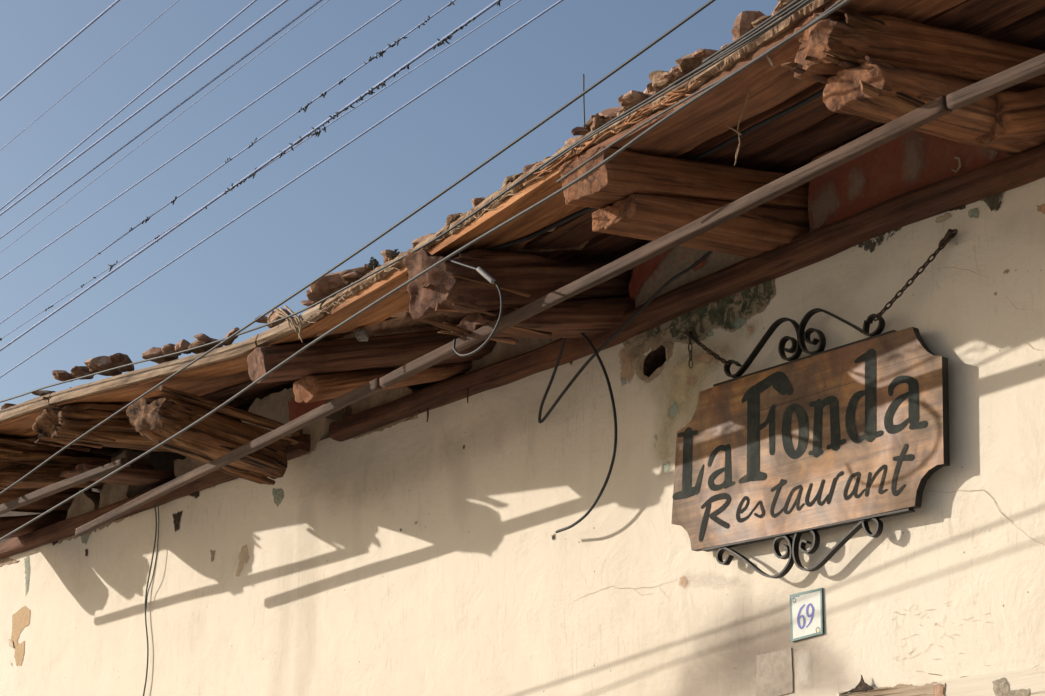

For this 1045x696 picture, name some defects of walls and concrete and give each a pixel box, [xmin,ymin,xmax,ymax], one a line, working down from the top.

spalling [620,279,776,436]
crack [937,490,1044,545]
peeling [236,545,249,576]
crack [570,578,678,611]
peeling [9,606,30,666]
peeling [834,682,946,696]
peeling [993,677,1030,696]